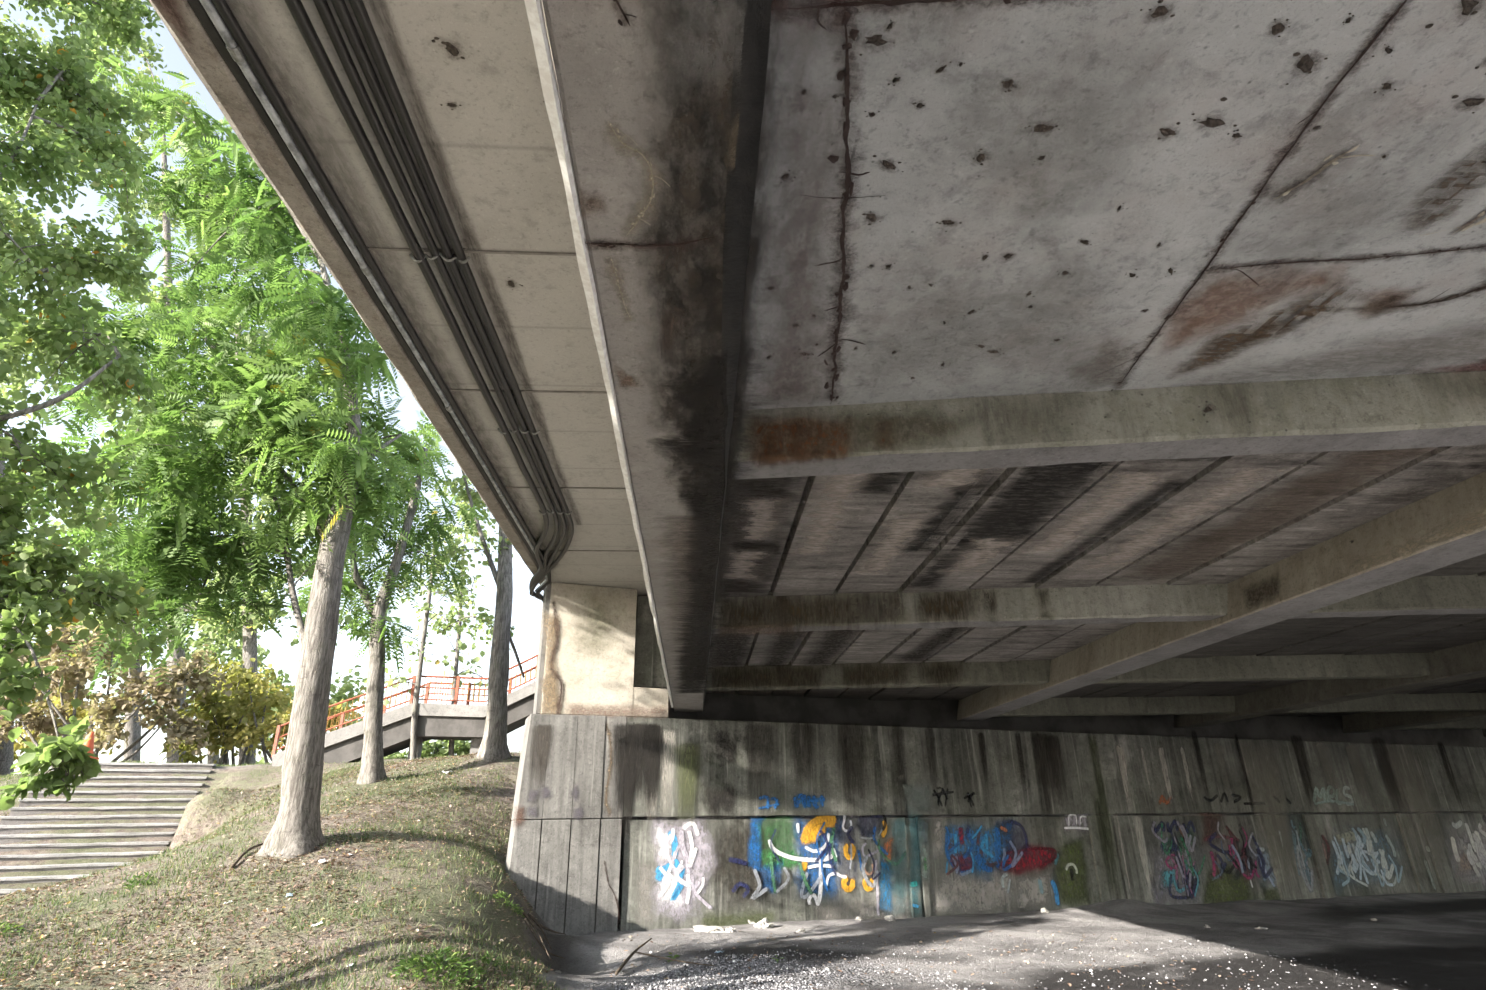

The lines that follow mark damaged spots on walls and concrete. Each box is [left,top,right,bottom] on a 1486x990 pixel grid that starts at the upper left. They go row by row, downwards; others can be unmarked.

crack [771,0,1043,404]
crack [1099,0,1486,391]
damp [607,0,996,693]
rust [751,417,851,463]
damp [944,472,1162,573]
damp [1075,468,1269,570]
damp [530,725,551,785]
damp [567,705,674,823]
damp [706,725,773,785]
damp [978,733,987,776]
damp [1015,733,1066,806]
damp [702,784,771,901]